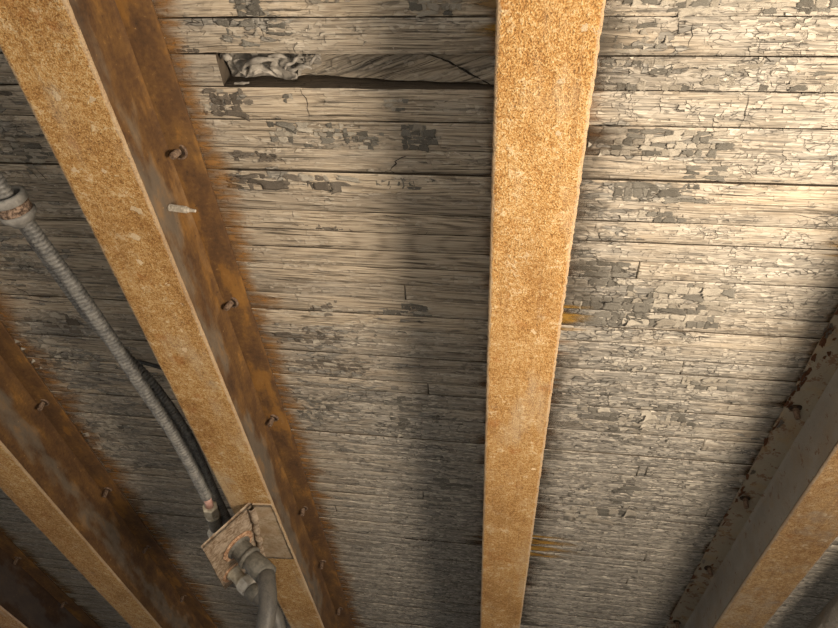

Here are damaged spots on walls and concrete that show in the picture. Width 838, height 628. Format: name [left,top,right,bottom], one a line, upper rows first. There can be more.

crack [403,29,492,86]
peeling [202,88,254,122]
peeling [587,126,736,223]
peeling [573,260,737,329]
peeling [610,359,737,392]
peeling [783,309,838,408]
peeling [567,402,704,440]
peeling [563,486,652,527]